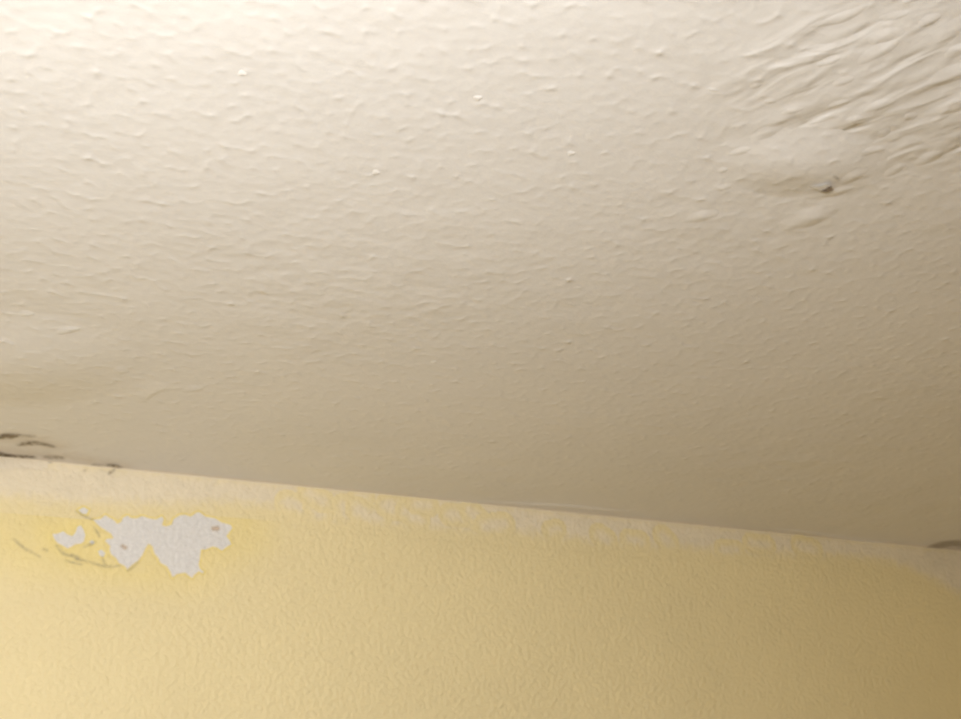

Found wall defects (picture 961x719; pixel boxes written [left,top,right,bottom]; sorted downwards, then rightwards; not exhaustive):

leakage [0,426,149,470]
peeling [50,505,234,580]